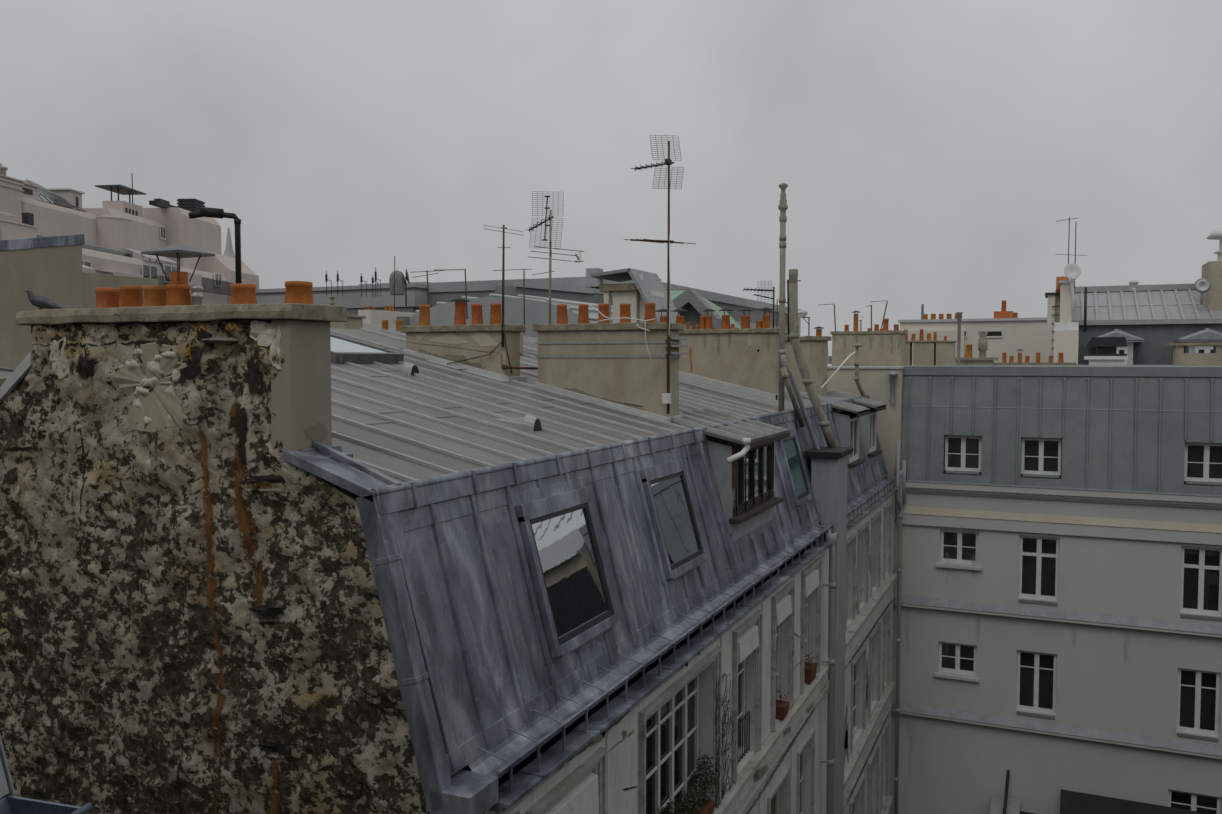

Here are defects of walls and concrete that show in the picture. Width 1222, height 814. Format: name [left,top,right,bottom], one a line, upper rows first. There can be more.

damp [171,346,203,382]
damp [231,403,247,467]
corrosion [231,399,271,607]
corrosion [199,425,226,814]